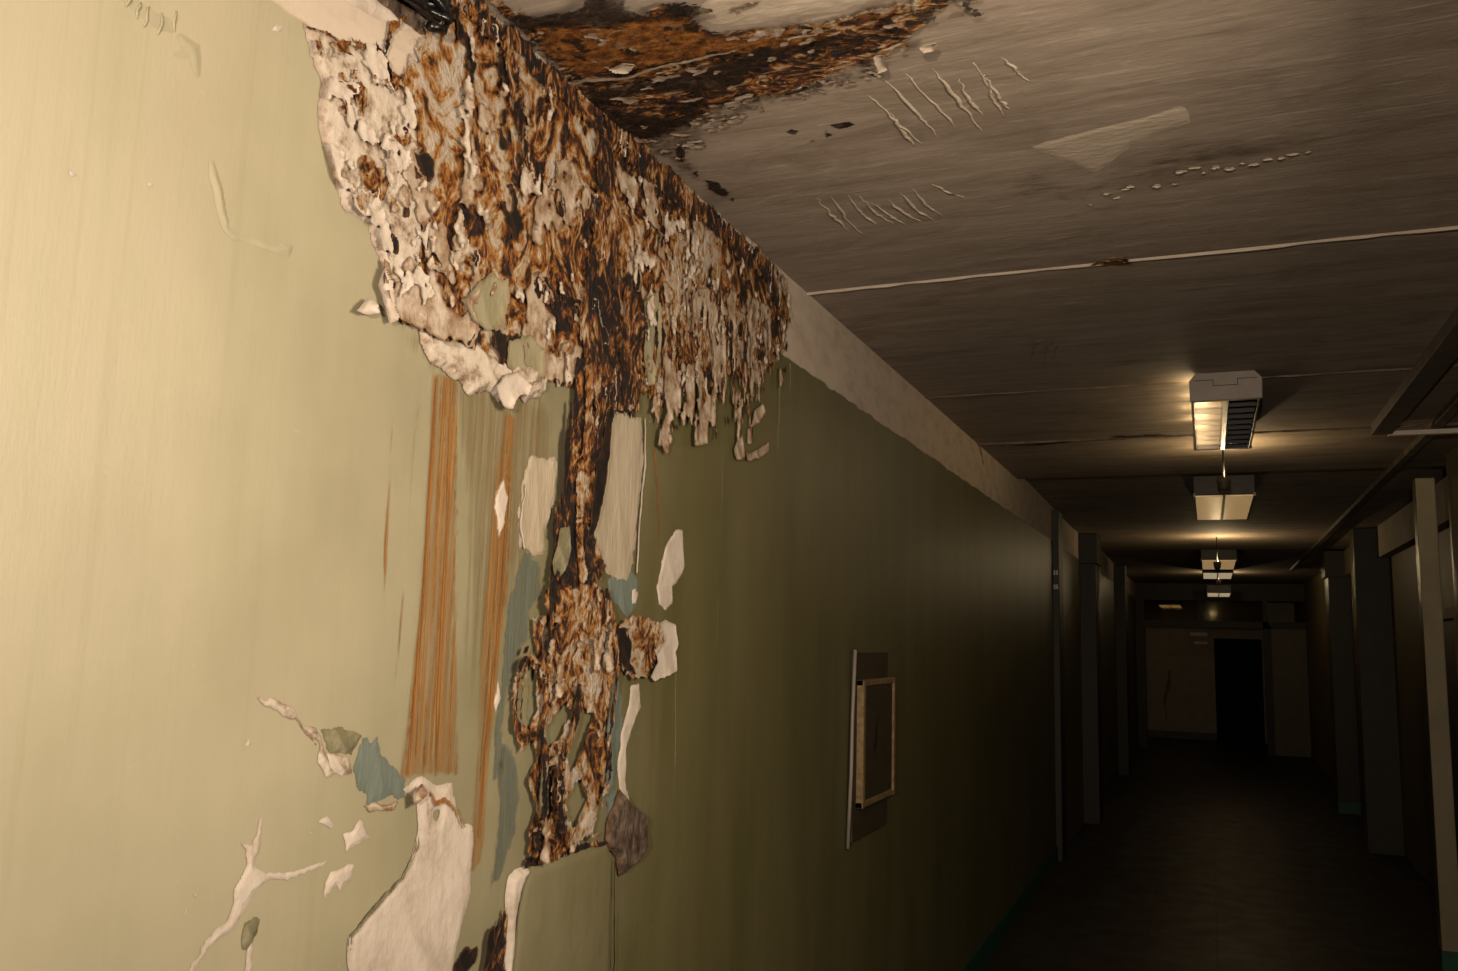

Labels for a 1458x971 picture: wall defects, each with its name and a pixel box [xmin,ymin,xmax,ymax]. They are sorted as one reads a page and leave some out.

flaking render [698,0,870,26]
peeling [303,23,548,409]
peeling [257,696,362,778]
peeling [189,776,496,971]
rust [399,376,458,776]
rust [470,413,513,871]
flaking render [494,283,791,875]